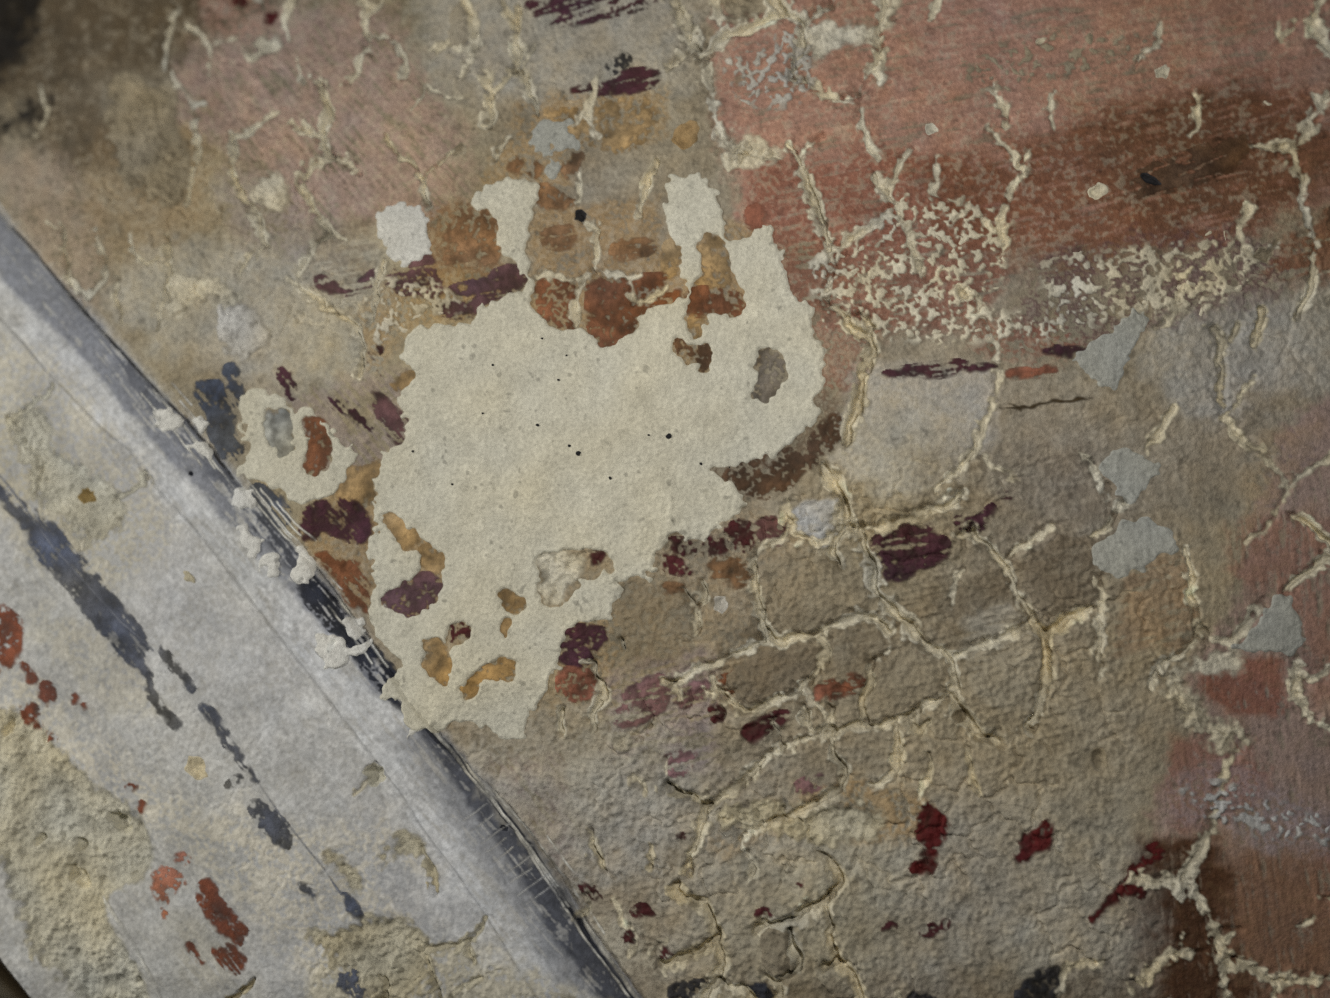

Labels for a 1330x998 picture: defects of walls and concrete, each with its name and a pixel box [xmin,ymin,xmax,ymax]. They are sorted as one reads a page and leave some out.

crack [1275,0,1330,58]
flaking render [249,171,289,213]
crack [163,0,540,381]
peeling [363,277,460,345]
crack [534,171,669,328]
peeling [808,193,1259,348]
flaking render [535,550,586,605]
crack [572,0,1109,998]
crack [1055,90,1330,998]
crack [556,640,626,736]
flaking render [0,709,153,998]
flaking render [305,912,429,998]